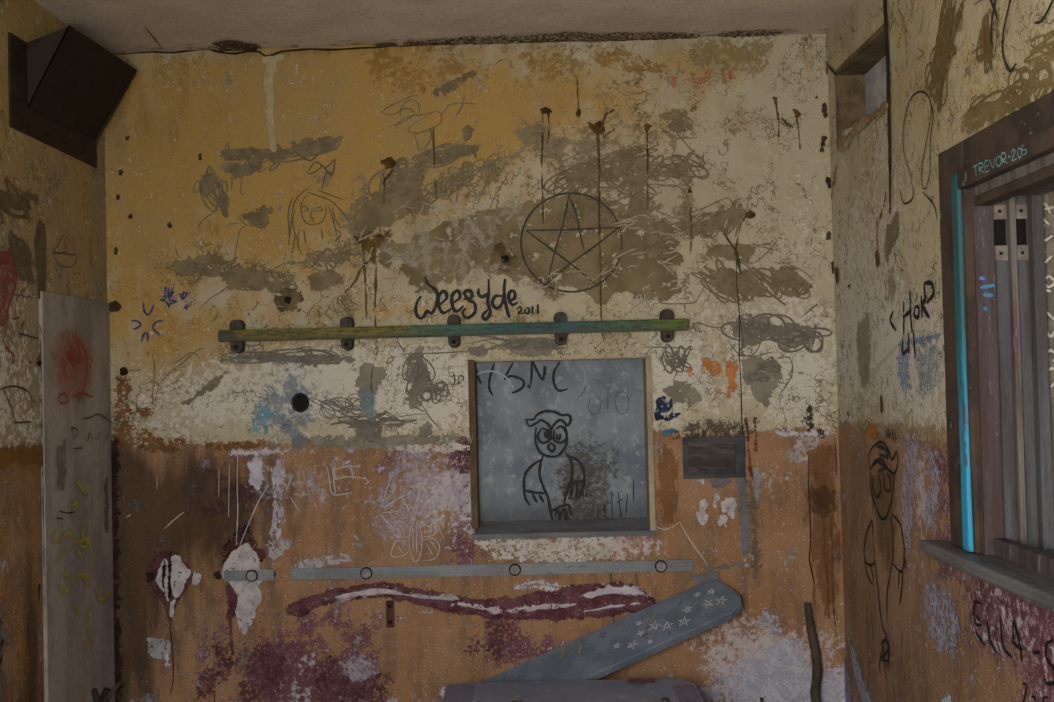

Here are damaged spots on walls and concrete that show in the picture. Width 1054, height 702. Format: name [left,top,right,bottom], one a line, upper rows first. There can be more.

peeling [378,177,708,305]
corrosion [540,107,552,224]
corrosion [576,80,615,351]
corrosion [644,124,652,208]
peeling [663,243,814,408]
spalling [181,345,614,702]
peeling [855,419,947,556]
peeling [147,637,171,667]
spalling [142,550,192,621]
damp [700,607,851,702]
peeling [918,577,1004,659]